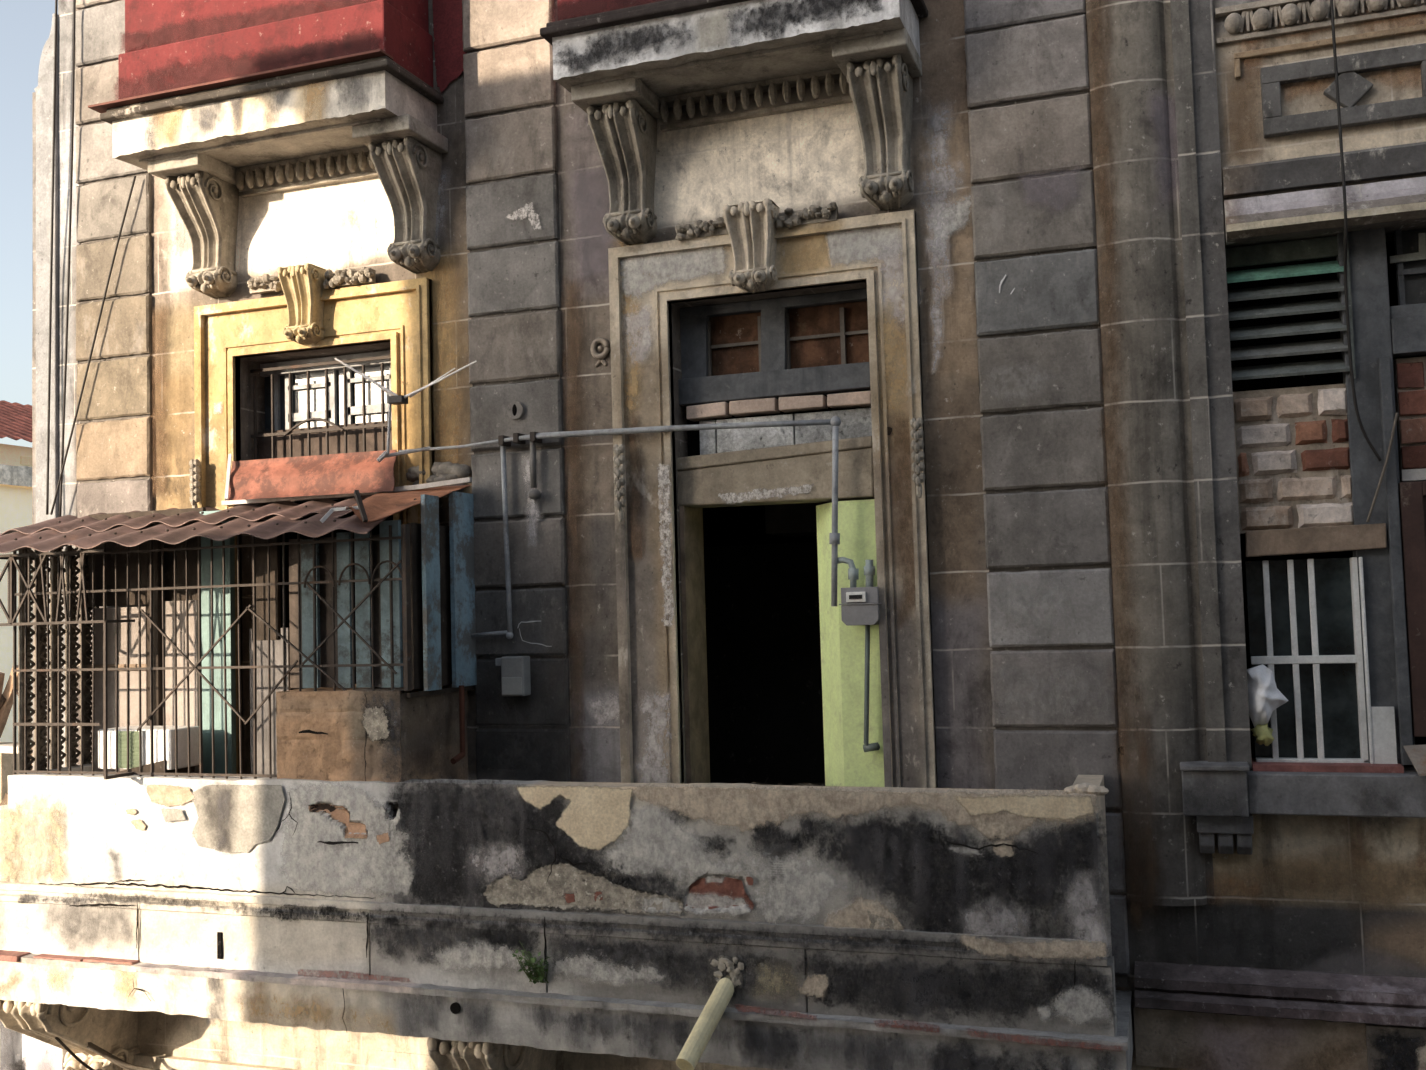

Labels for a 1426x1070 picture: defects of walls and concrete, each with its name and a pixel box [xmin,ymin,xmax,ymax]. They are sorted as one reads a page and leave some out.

mould [555,20,691,73]
mould [728,0,882,41]
leakage [640,696,668,783]
spalling [126,809,146,830]
peeling [146,784,414,896]
peeling [483,786,1097,941]
leakage [0,776,1157,1070]